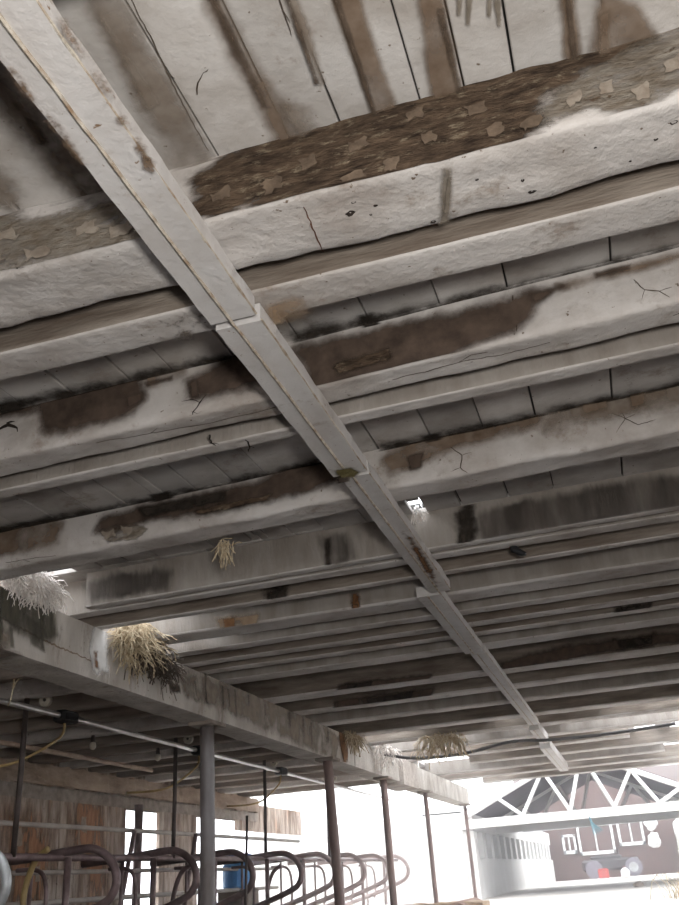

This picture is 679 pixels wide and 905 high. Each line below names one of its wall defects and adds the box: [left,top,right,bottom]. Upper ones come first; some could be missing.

water stain [419,0,462,98]
water stain [457,0,472,24]
water stain [560,0,581,60]
water stain [593,0,654,54]
water stain [0,78,104,197]
peeling [191,27,679,217]
peeling [0,201,141,271]
crack [634,280,679,316]
spalling [101,525,147,542]